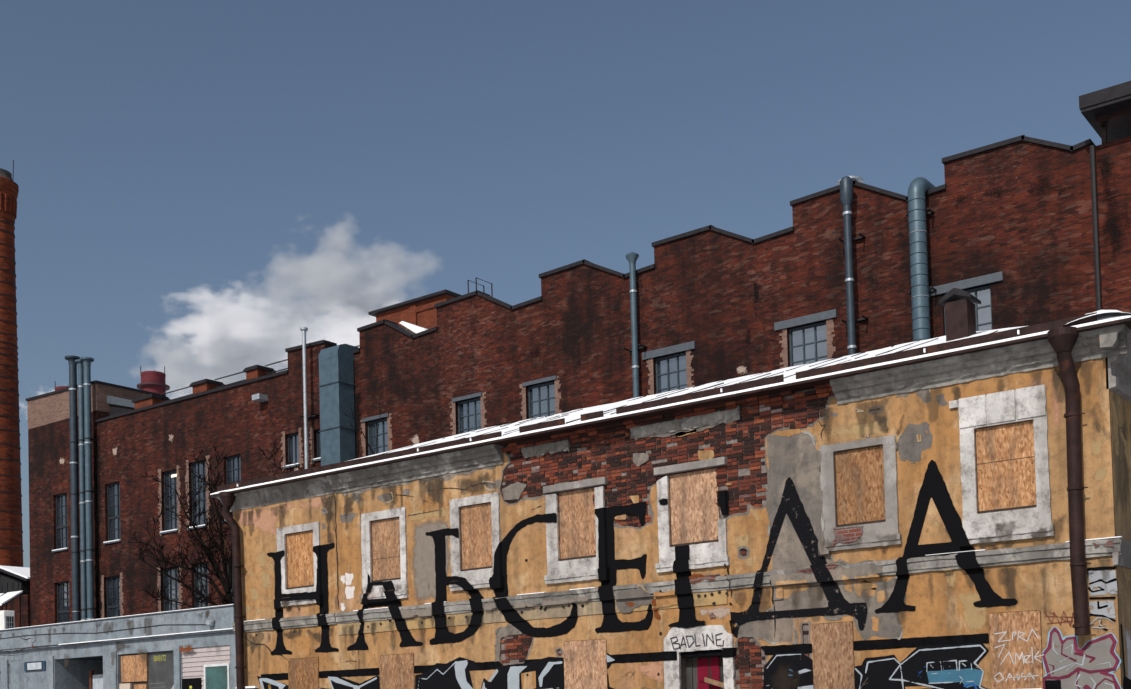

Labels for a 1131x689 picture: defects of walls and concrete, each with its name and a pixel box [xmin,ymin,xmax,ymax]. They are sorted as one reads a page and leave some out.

peeling [895,389,948,406]
damp [875,417,901,434]
spalling [235,392,933,689]